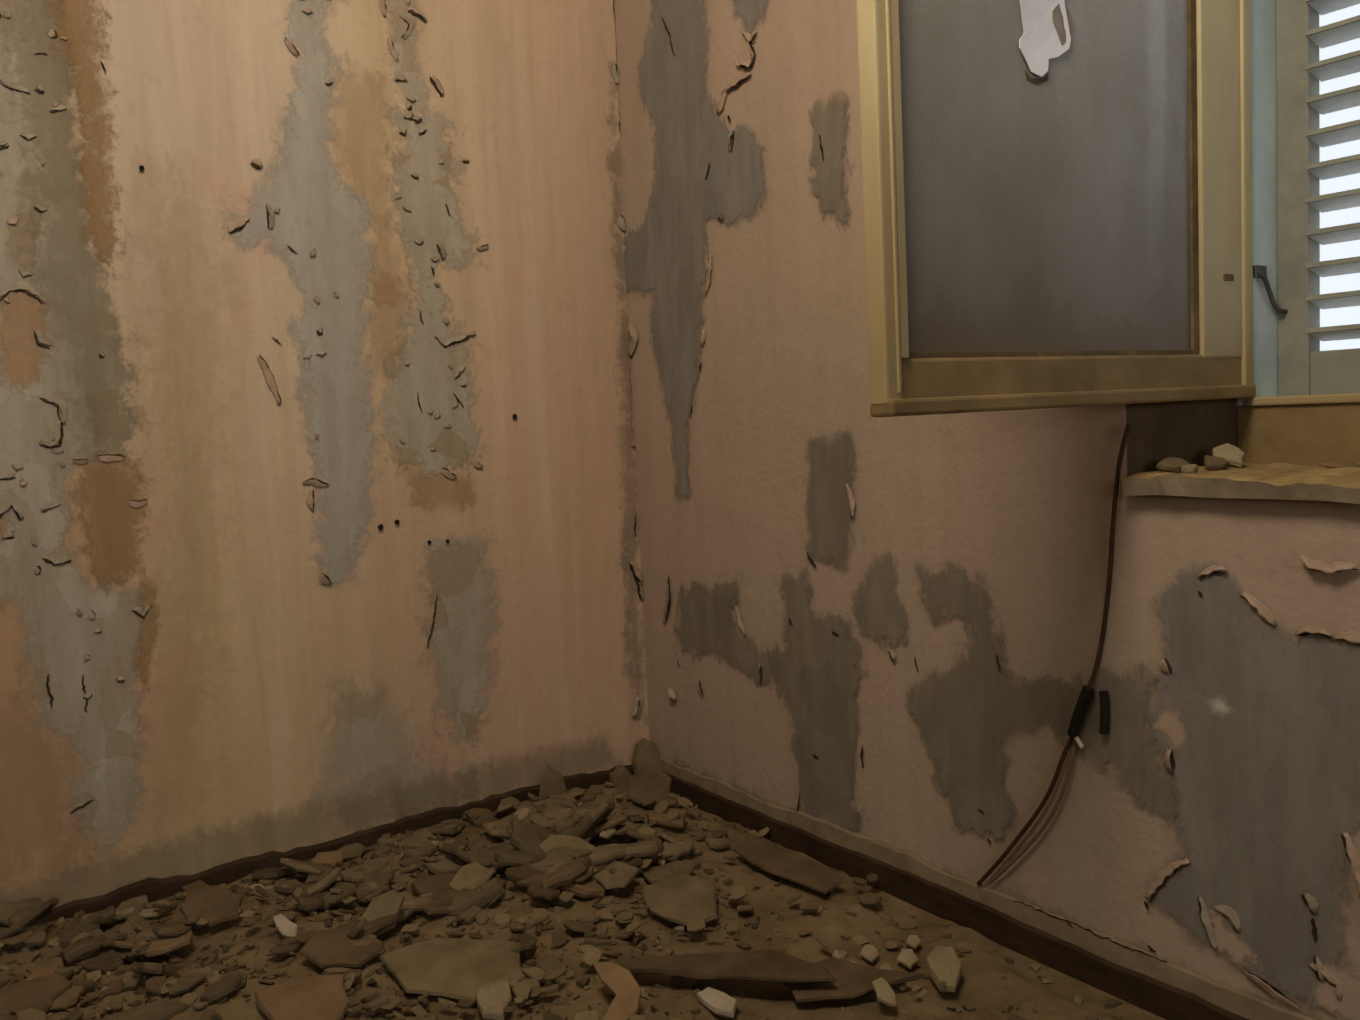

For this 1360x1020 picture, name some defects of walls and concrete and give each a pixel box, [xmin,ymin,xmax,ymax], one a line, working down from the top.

peeling [0,0,151,845]
peeling [223,0,489,586]
peeling [624,0,767,500]
peeling [663,431,908,833]
spalling [832,935,921,1008]
peeling [905,561,1360,1010]